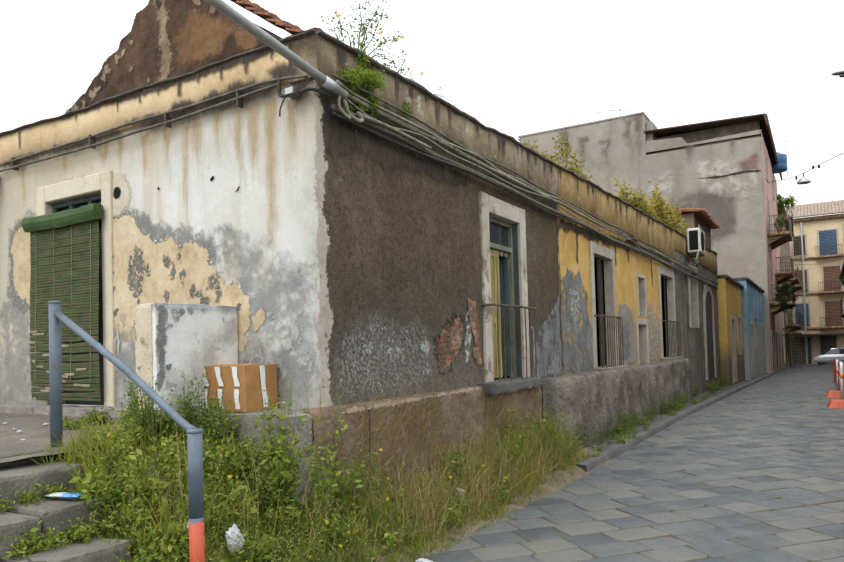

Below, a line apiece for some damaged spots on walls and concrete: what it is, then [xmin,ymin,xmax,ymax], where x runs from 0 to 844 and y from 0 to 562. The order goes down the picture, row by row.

peeling [174,0,257,64]
peeling [65,40,133,113]
peeling [7,221,36,314]
peeling [112,174,265,391]
flaking render [433,298,482,374]